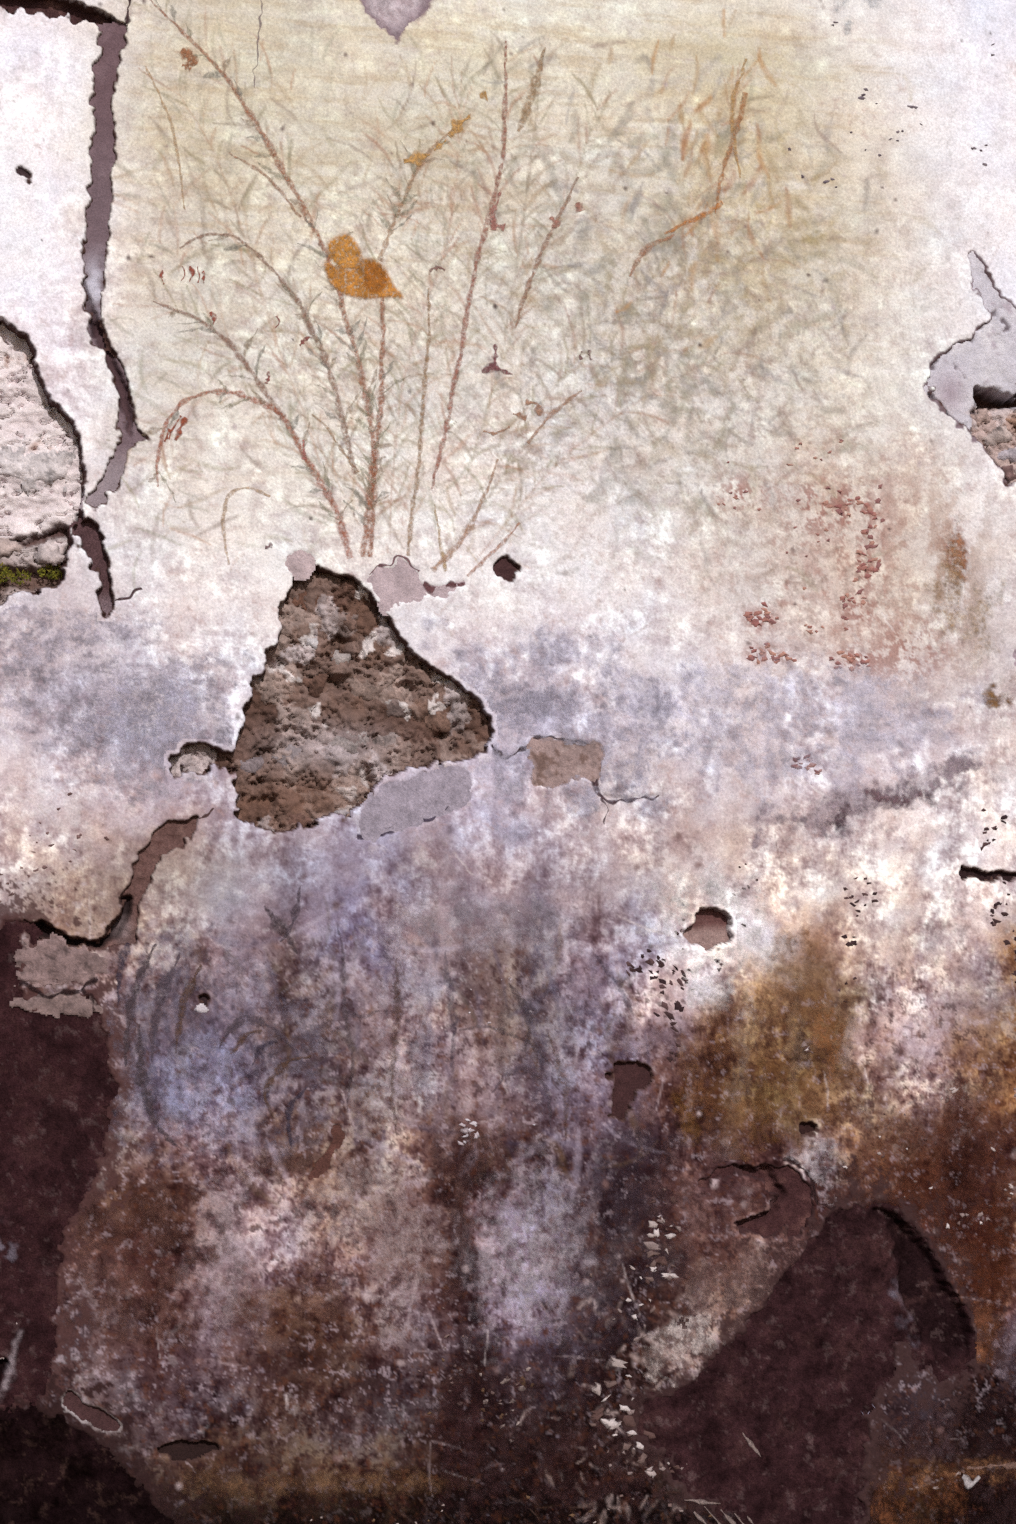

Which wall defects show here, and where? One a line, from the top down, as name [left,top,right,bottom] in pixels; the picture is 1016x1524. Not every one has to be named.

crack [254,1,263,88]
flaking render [361,0,432,40]
flaking render [0,324,83,605]
crack [0,0,147,617]
flaking render [924,251,1016,485]
flaking render [169,550,491,843]
flaking render [526,736,605,789]
spalling [683,908,730,951]
spalling [605,1062,652,1120]
flaking render [0,919,174,1524]
spalling [157,1440,219,1461]
flaking render [637,1164,977,1524]